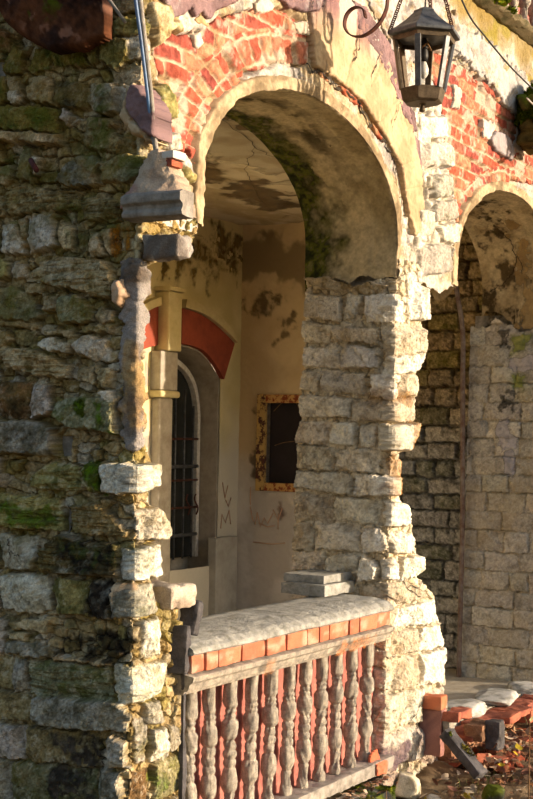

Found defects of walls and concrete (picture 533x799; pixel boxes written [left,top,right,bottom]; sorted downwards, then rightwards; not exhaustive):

spalling [119,83,168,147]
flaking render [150,0,326,164]
flaking render [205,115,300,212]
flaking render [352,0,533,223]
leakage [242,291,281,318]